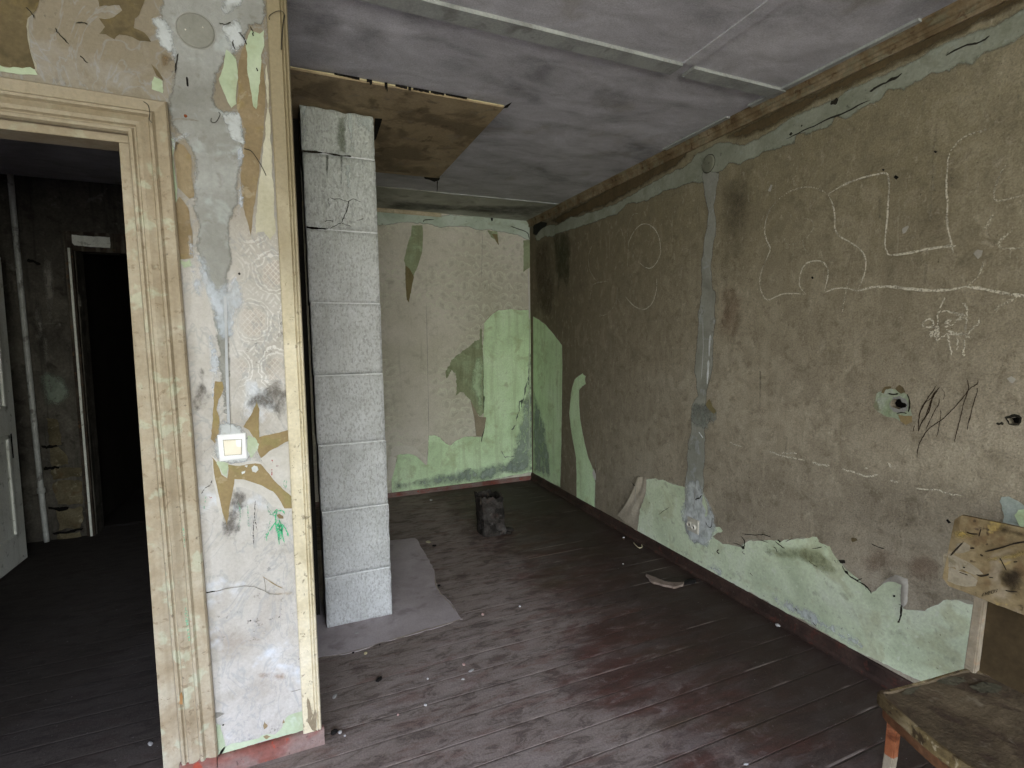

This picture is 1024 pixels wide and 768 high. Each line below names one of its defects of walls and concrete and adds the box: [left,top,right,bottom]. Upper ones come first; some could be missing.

peeling [0,0,39,75]
flaking render [98,0,292,526]
crack [325,197,364,228]
peeling [377,9,1024,507]
water stain [420,363,549,484]
peeling [637,478,973,681]